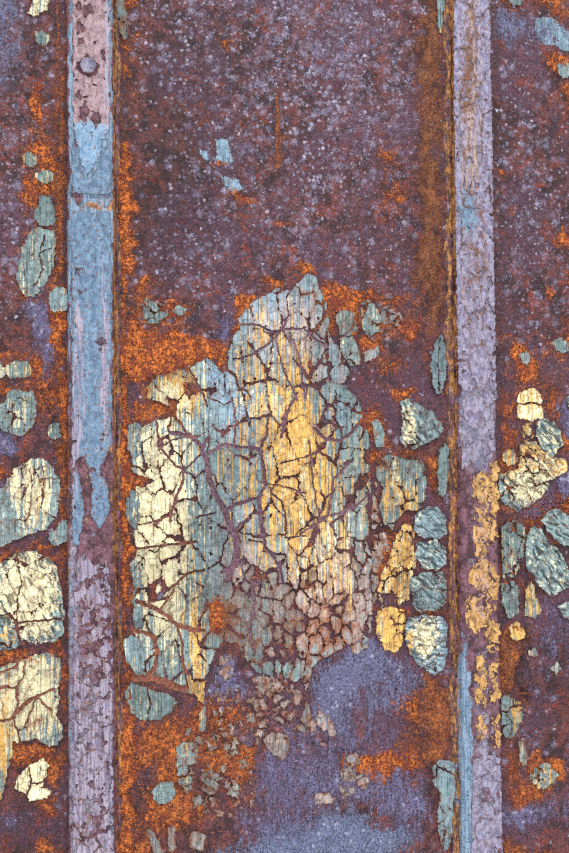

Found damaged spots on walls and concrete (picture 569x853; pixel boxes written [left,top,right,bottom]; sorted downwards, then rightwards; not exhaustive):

corrosion [18,4,67,290]
peeling [71,0,129,195]
corrosion [293,0,445,375]
crack [0,552,61,744]
corrosion [0,311,68,522]
peeling [0,195,114,853]
corrosion [116,141,257,634]
corrosion [117,645,258,853]
crack [131,288,371,694]
peeling [123,273,450,818]
peeling [431,759,456,852]
peeling [436,0,569,853]